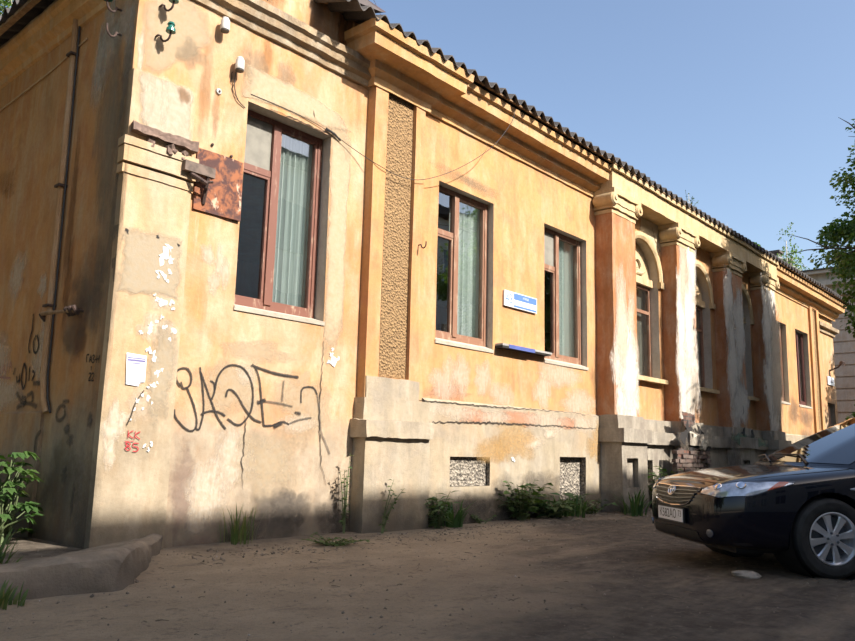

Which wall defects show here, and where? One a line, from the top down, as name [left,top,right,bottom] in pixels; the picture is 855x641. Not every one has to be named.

damp [94,1,133,348]
peeling [104,293,177,465]
peeling [155,244,173,283]
crack [419,400,597,429]
peeling [612,274,639,417]
peeling [672,242,712,474]
peeling [723,267,755,438]
peeling [762,282,784,431]